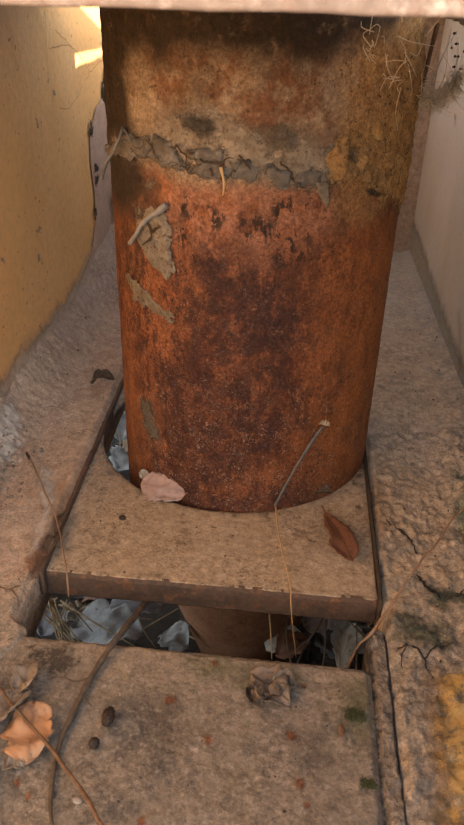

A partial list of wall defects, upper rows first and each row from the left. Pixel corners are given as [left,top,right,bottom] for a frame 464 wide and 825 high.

peeling [85,97,114,282]
damp [409,222,464,388]
crack [397,642,454,679]